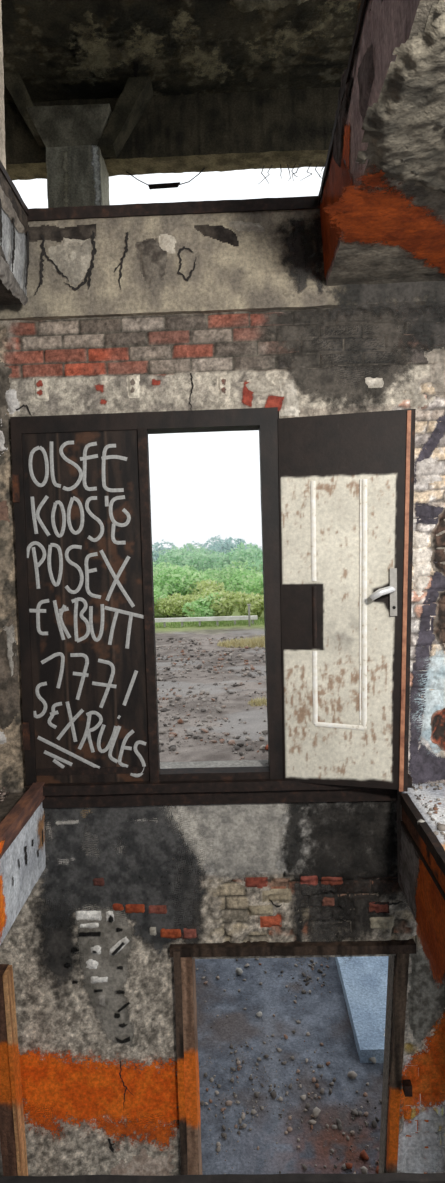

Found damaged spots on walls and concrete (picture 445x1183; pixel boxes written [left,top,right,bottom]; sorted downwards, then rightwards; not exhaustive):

crack [0,184,129,296]
crack [177,246,196,281]
spalling [217,374,284,411]
peeling [365,377,384,388]
peeling [414,456,444,486]
peeling [0,500,13,595]
peeling [412,508,445,653]
peeling [0,618,20,744]
spalling [430,708,445,758]
water stain [46,807,100,864]
water stain [172,852,206,944]
water stain [34,898,82,997]